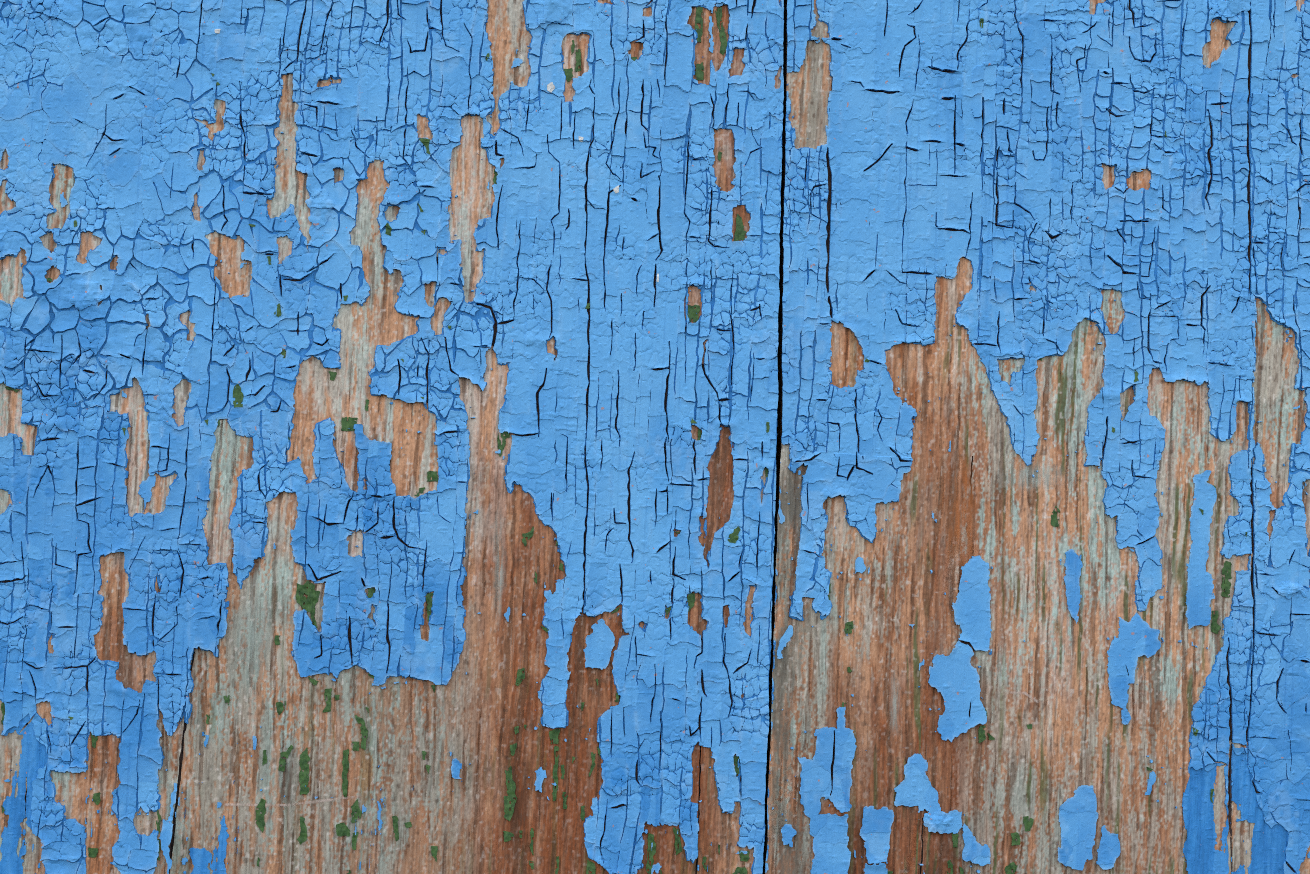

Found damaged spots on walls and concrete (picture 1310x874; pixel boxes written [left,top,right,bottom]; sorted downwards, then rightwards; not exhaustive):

peeling [39,164,102,283]
peeling [712,127,736,192]
peeling [774,0,832,149]
crack [805,148,832,325]
crack [854,0,1187,347]
crack [1107,10,1310,366]
peeling [0,700,52,874]
peeling [50,0,647,874]
crack [308,490,427,673]
crack [436,0,770,874]
peeling [637,257,1310,874]
crack [1207,463,1308,872]